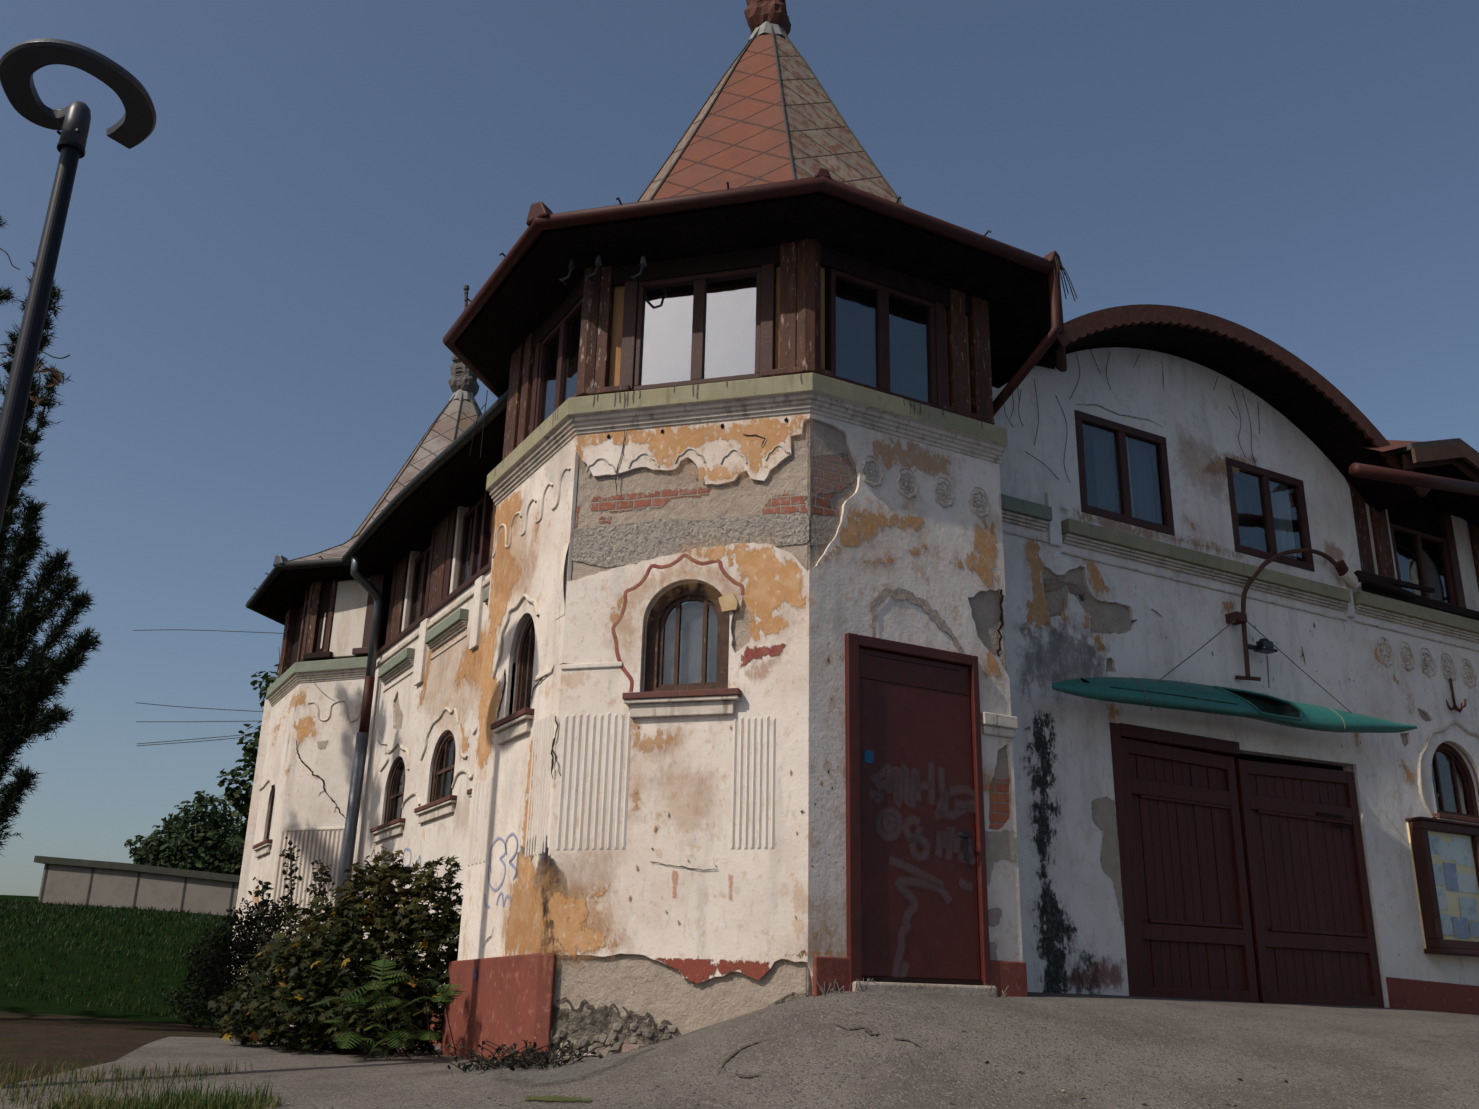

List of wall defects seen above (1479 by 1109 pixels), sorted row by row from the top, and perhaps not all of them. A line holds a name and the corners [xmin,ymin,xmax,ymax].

peeling [872,440,950,476]
peeling [454,491,522,773]
spalling [571,413,928,667]
spalling [957,519,1006,679]
spalling [1024,536,1134,672]
crack [296,740,346,819]
spalling [505,740,845,1058]
damp [1024,711,1097,994]
peeling [1092,797,1125,926]